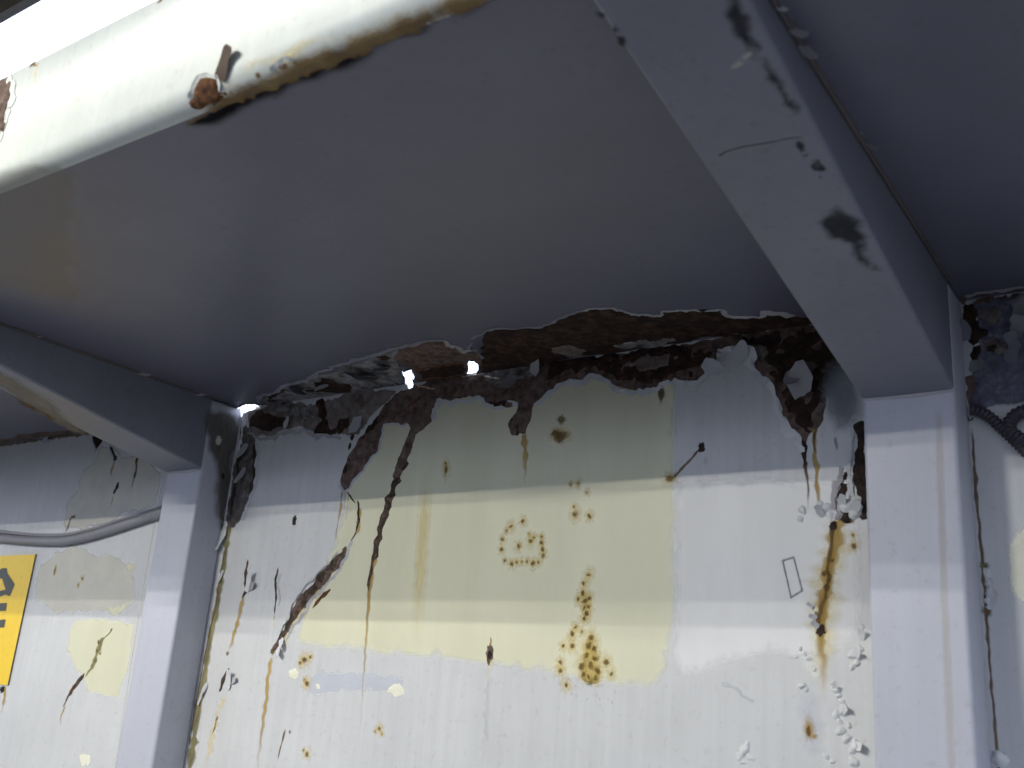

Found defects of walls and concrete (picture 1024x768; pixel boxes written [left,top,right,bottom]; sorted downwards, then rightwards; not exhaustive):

rust [0,74,16,141]
rust [187,0,492,126]
peeling [247,348,404,450]
peeling [822,364,858,449]
peeling [959,293,1024,421]
crack [215,413,261,550]
rust [336,307,840,690]
peeling [797,494,863,523]
crack [60,629,112,722]
crack [207,492,362,758]
rust [806,520,858,671]